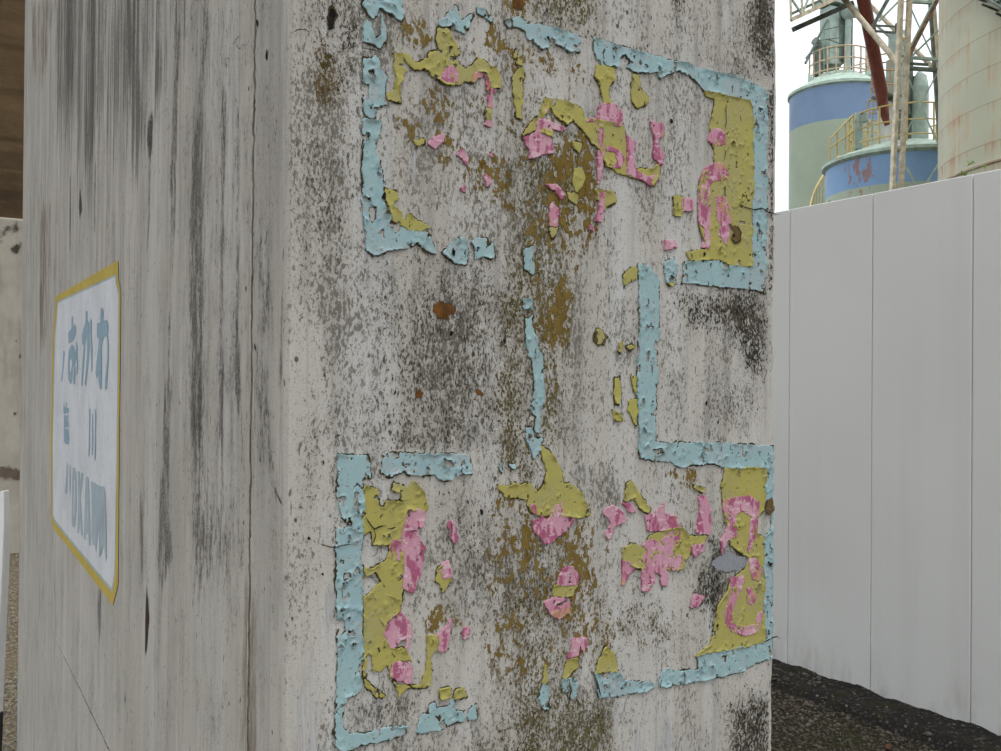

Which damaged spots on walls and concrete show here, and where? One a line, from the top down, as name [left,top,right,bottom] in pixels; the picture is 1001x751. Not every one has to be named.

rust [504,0,530,18]
peeling [360,0,775,700]
peeling [321,451,478,751]
peeling [538,664,551,711]